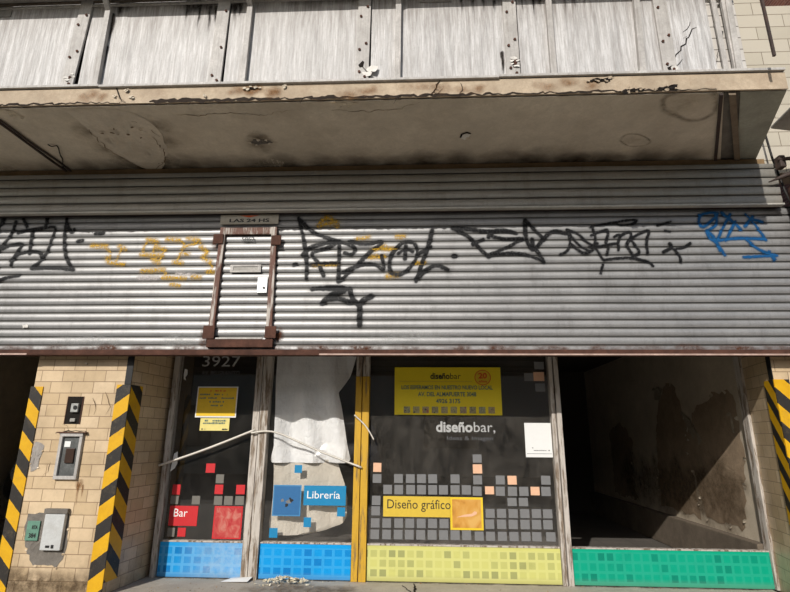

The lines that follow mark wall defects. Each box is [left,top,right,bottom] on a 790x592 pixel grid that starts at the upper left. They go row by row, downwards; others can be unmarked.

crack [675,21,723,65]
crack [0,88,124,109]
crack [149,80,717,116]